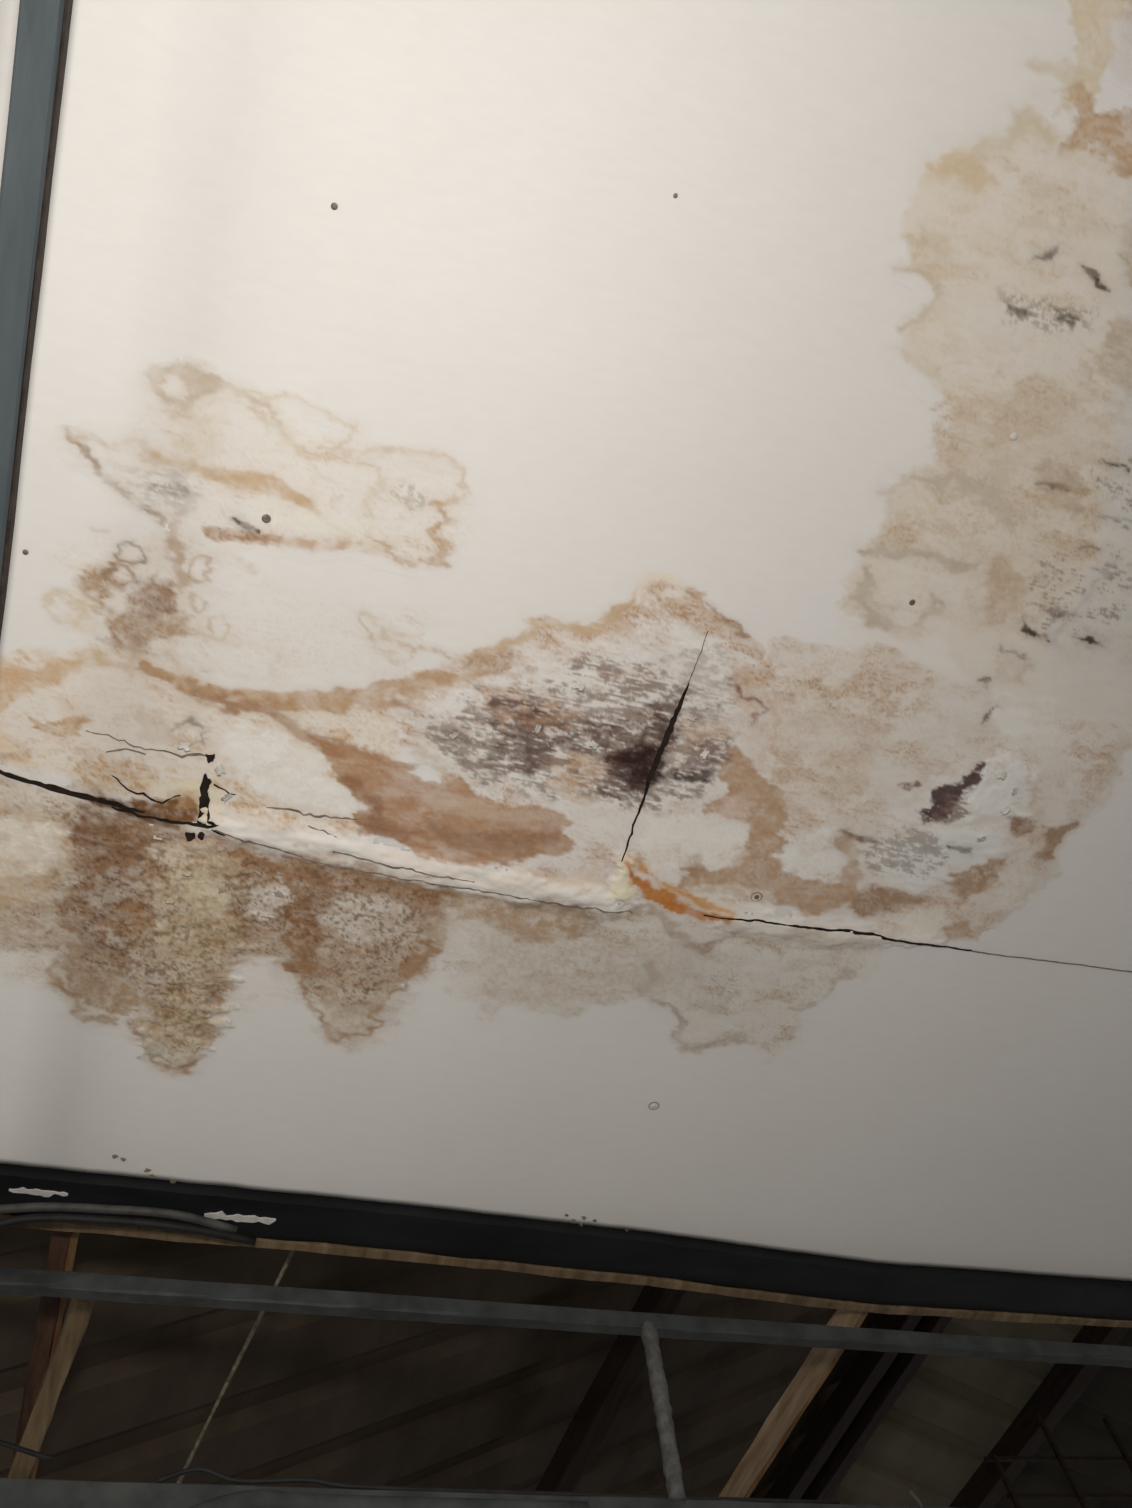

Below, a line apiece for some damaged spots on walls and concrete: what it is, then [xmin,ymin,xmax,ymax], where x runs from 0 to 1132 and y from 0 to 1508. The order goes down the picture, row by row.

leakage [0,0,1132,1083]
peeling [136,741,255,1068]
crack [0,730,633,914]
crack [621,631,709,862]
corrosion [625,851,737,926]
crack [703,915,1132,972]